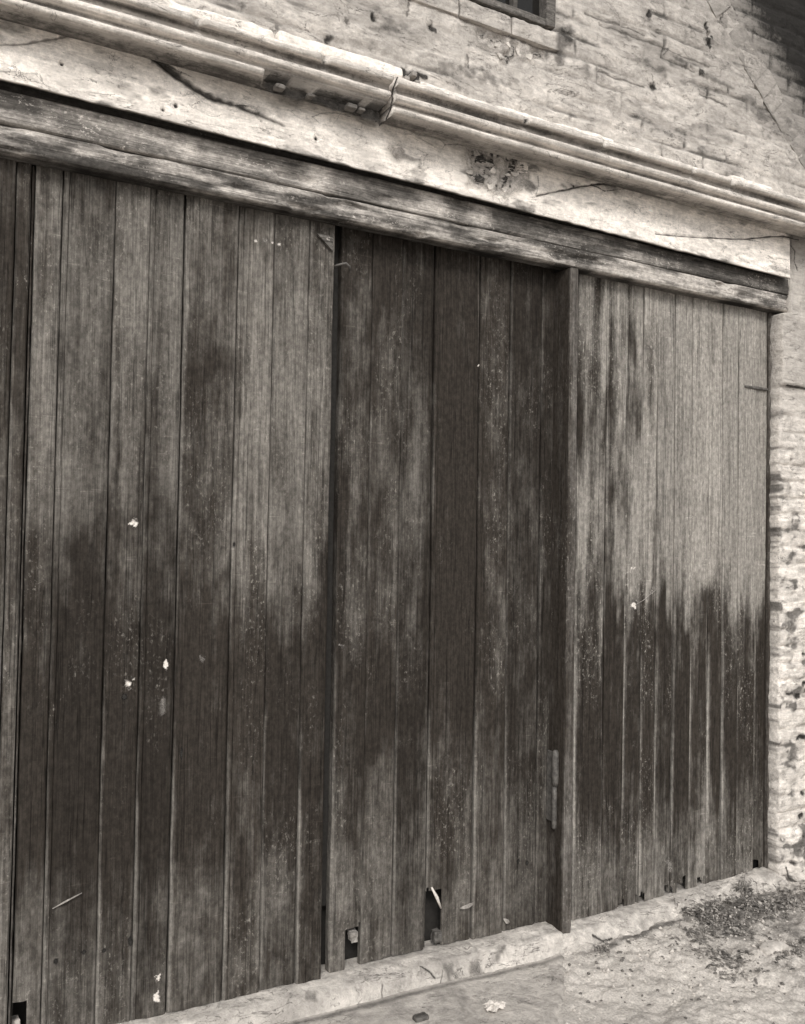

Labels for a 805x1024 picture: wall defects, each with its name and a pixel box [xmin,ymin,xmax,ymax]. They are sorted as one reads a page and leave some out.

crack [152,60,276,123]
crack [386,77,398,120]
spalling [465,148,529,195]
crack [536,179,621,197]
crack [656,234,799,270]